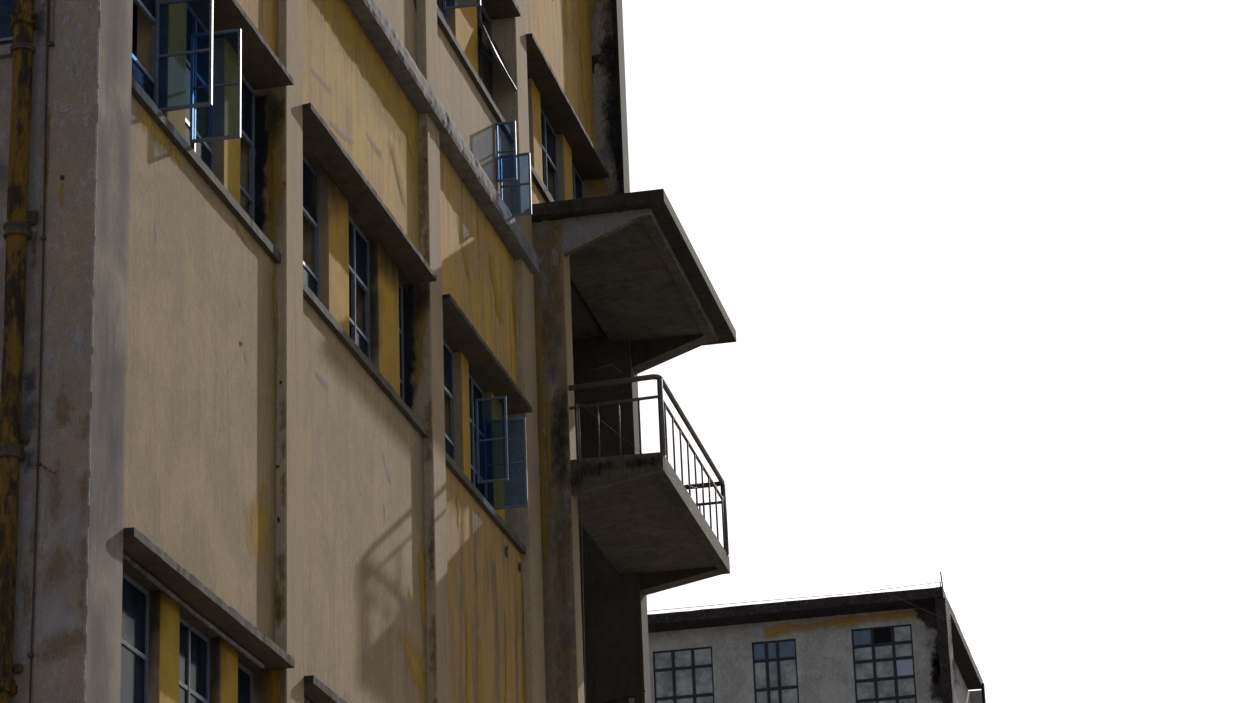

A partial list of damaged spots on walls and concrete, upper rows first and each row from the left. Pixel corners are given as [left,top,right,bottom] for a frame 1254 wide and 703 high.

water stain [562,0,624,194]